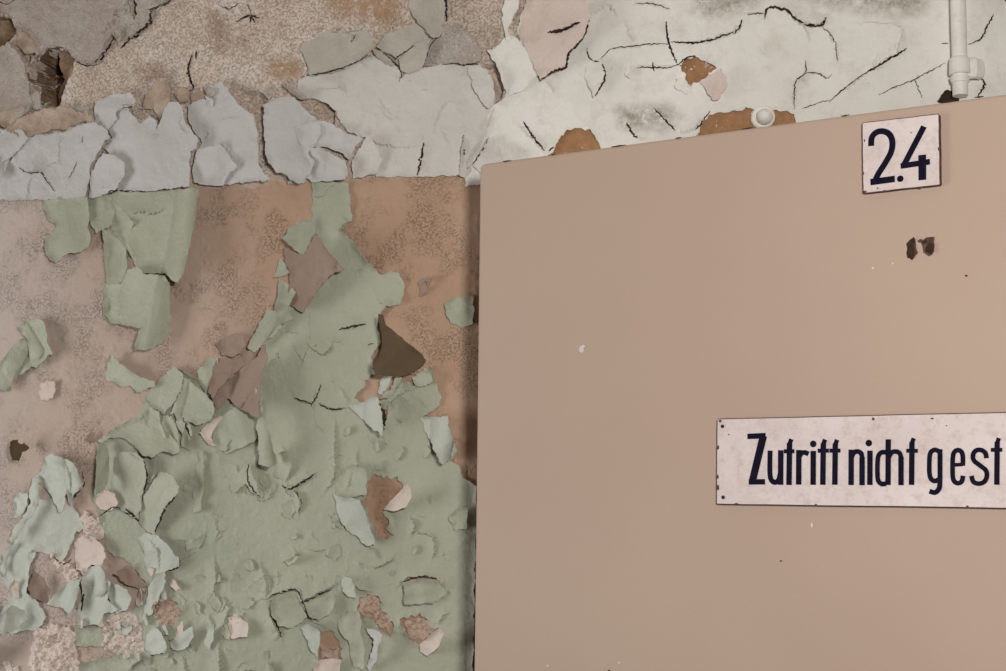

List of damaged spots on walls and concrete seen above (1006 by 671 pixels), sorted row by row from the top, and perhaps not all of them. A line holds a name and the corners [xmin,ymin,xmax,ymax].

spalling [0,12,17,47]
crack [0,0,171,112]
peeling [262,0,952,187]
crack [539,2,907,109]
crack [879,0,1006,97]
peeling [959,0,1006,101]
peeling [0,47,271,350]
spalling [906,237,935,260]
peeling [0,181,477,671]